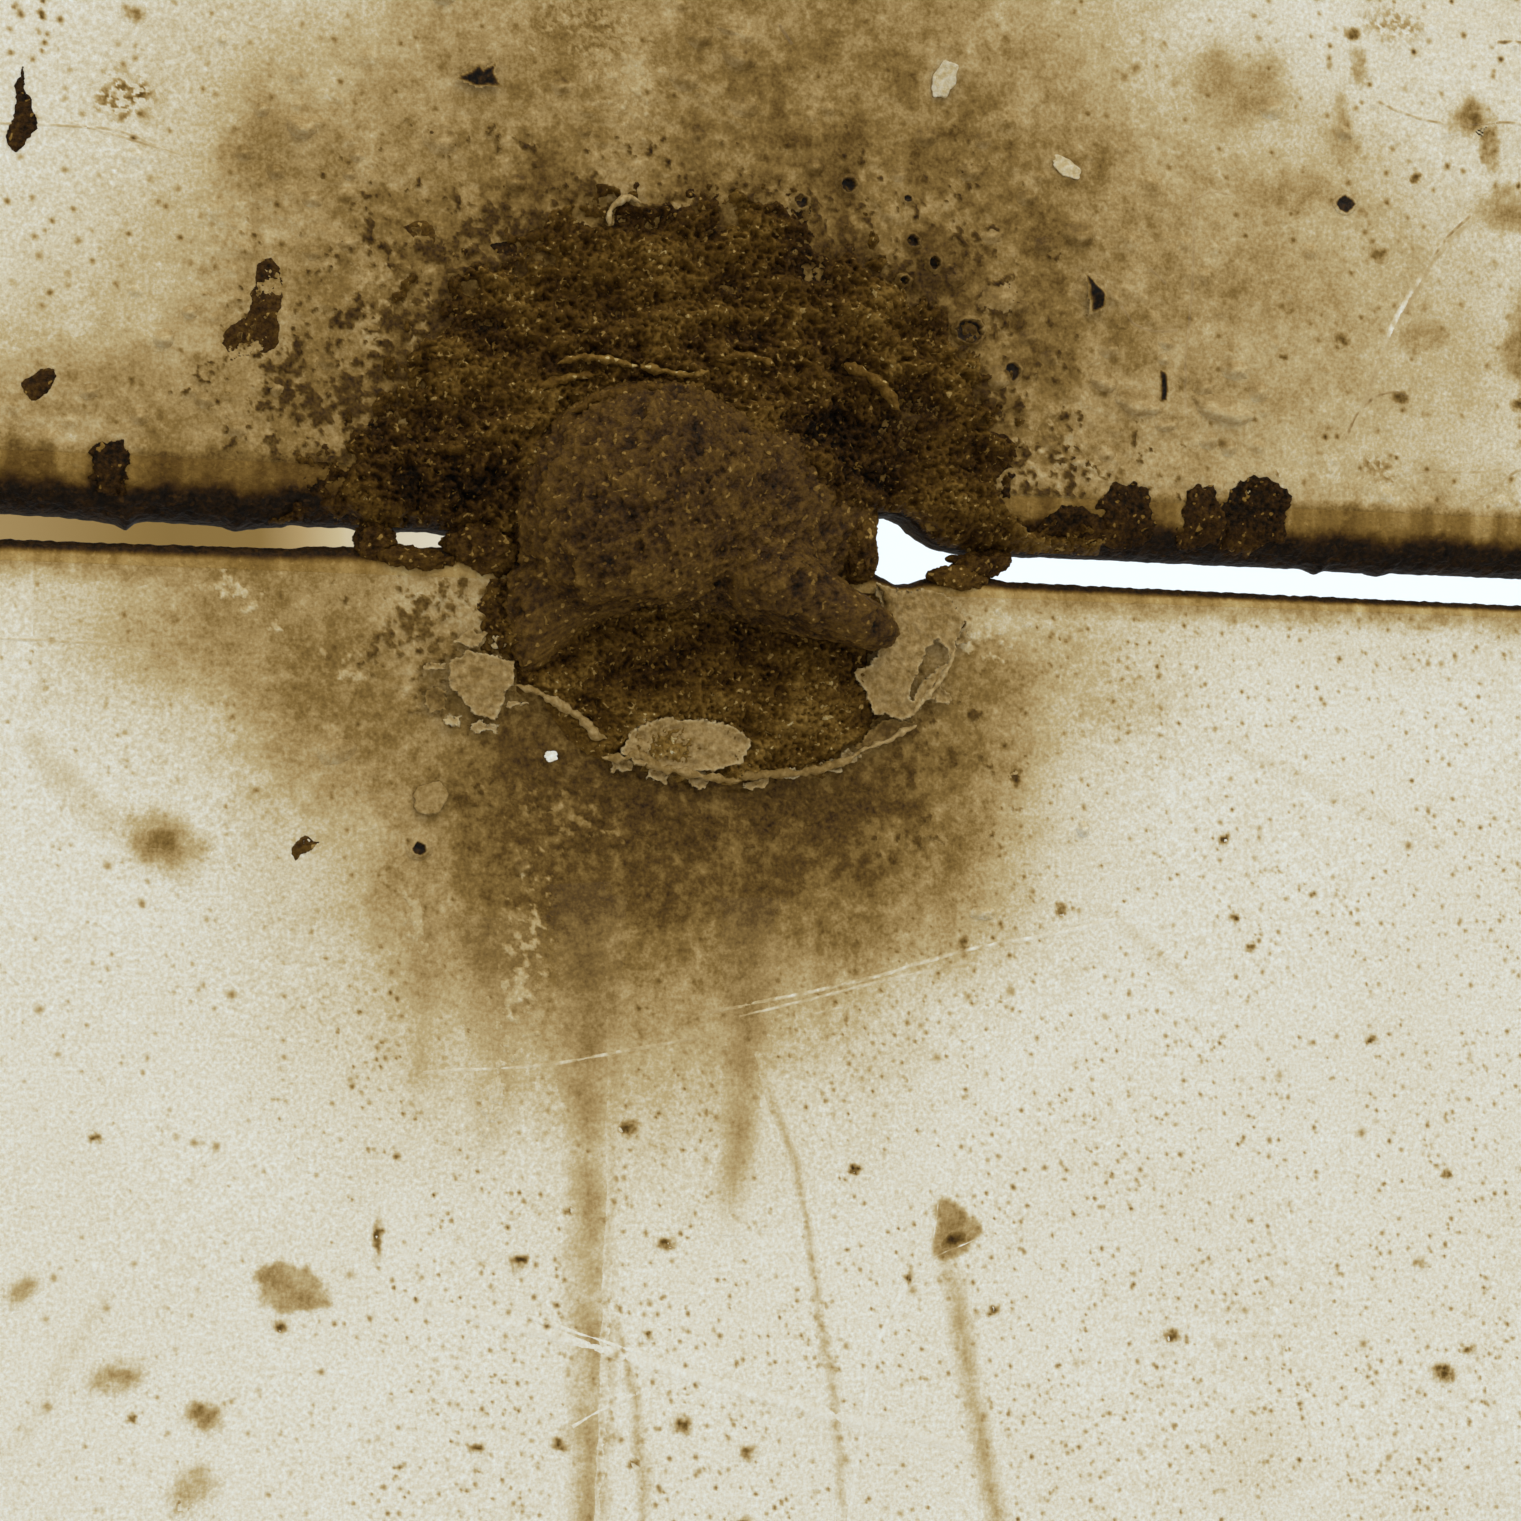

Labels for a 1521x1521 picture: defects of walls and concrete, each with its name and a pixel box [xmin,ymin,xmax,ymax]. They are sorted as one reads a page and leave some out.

rust [0,0,1521,558]
peeling [423,582,972,790]
rust [0,560,1521,1521]